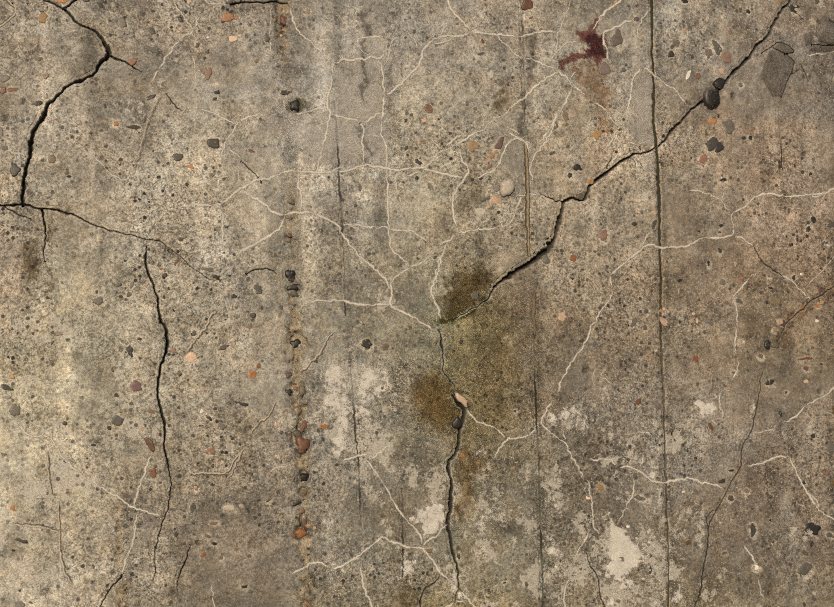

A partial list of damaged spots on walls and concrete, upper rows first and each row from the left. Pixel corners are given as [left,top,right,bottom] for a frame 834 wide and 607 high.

crack [0,0,243,607]
water stain [397,554,416,584]
water stain [409,500,445,536]
crack [190,0,834,607]